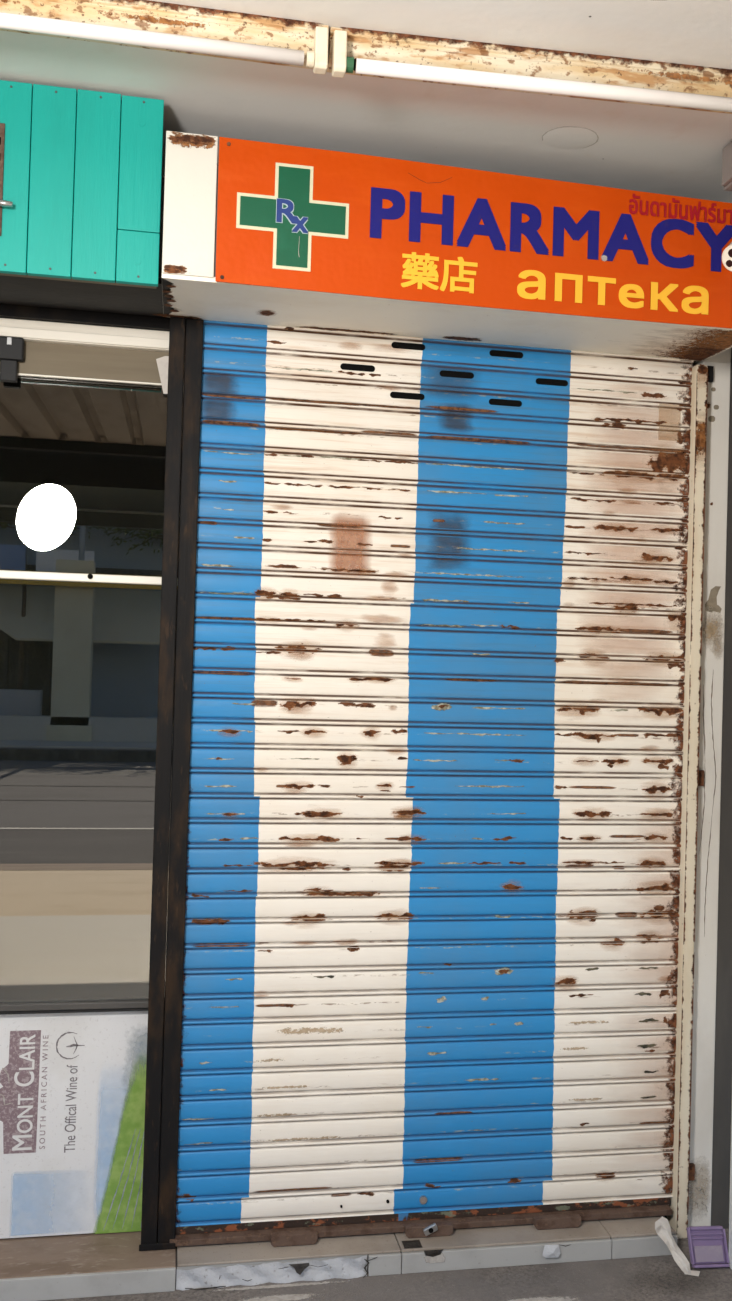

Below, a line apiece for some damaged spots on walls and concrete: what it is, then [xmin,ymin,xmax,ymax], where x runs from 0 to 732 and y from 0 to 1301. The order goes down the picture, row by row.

rust [304,520,377,573]
rust [255,590,341,600]
rust [196,616,358,628]
rust [256,643,321,654]
rust [369,649,394,657]
rust [252,700,317,711]
rust [363,728,407,737]
rust [337,755,357,765]
rust [555,360,708,1234]
rust [223,861,351,871]
rust [304,888,380,897]
rust [291,913,327,921]